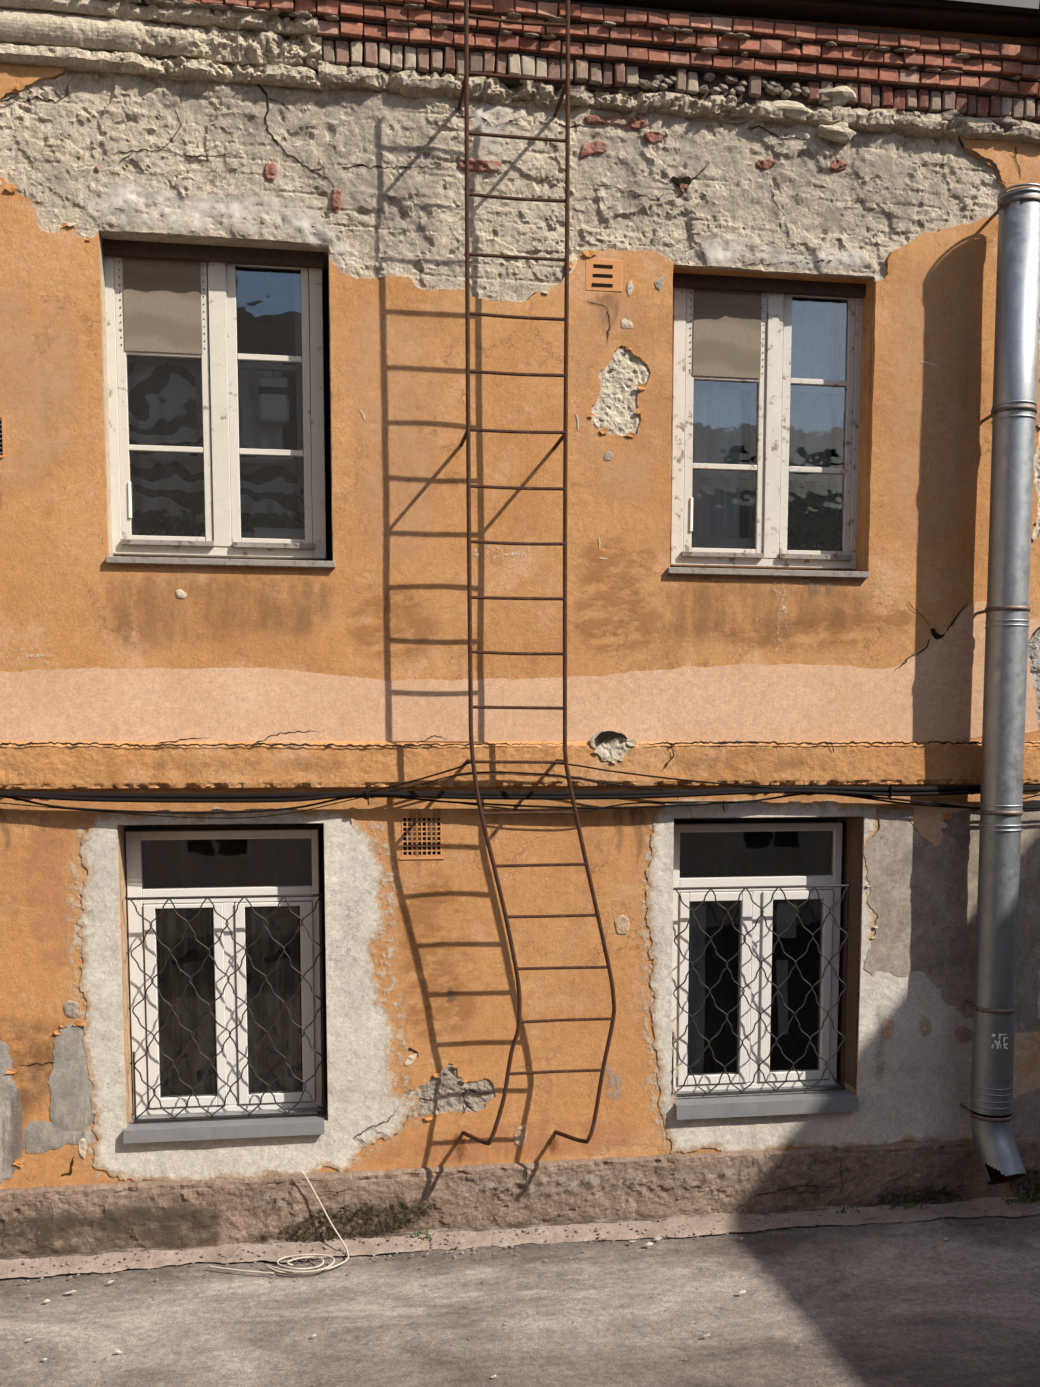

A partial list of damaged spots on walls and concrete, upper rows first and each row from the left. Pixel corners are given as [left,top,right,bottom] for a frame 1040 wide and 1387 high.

crack [1,81,70,103]
crack [114,66,458,188]
spalling [0,59,1005,303]
spalling [589,318,650,437]
peeling [1032,422,1040,540]
crack [894,601,967,672]
spalling [1028,628,1040,726]
spalling [590,731,638,763]
peeling [911,800,980,847]
peeling [392,1062,496,1156]
peeling [1013,1031,1040,1097]